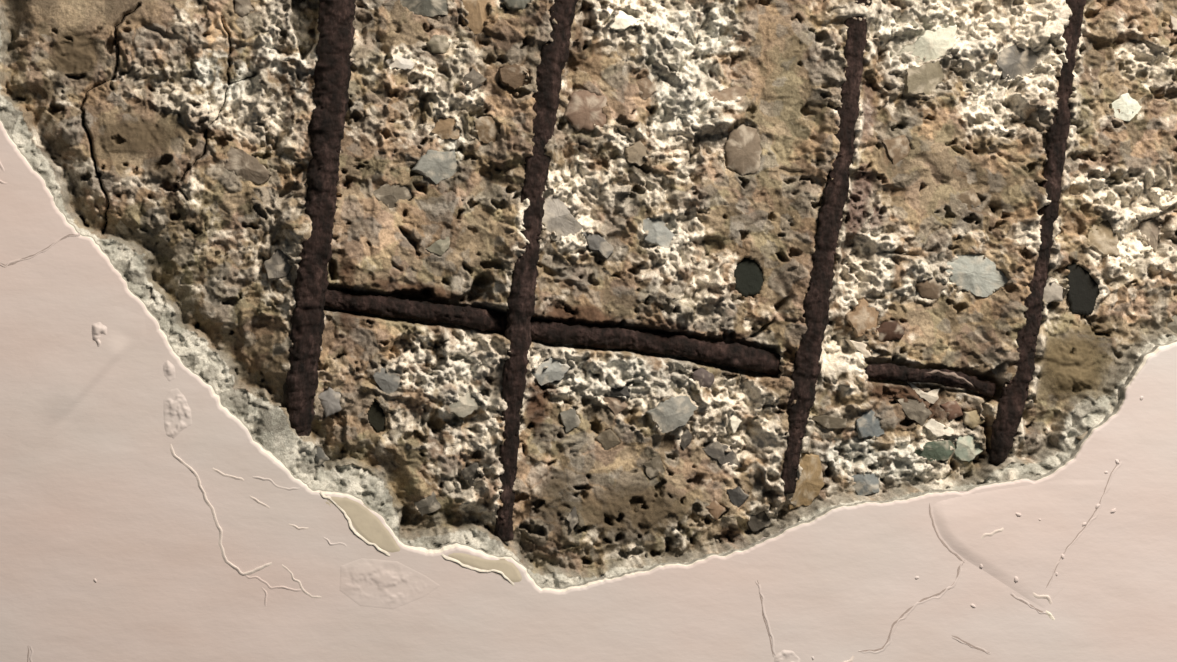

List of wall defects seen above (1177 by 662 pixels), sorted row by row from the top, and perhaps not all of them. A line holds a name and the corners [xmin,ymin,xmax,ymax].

crack [0,5,140,267]
spalling [0,0,557,564]
rust [377,281,457,303]
rust [528,383,557,427]
rust [531,305,620,328]
spalling [369,0,1177,592]
rust [870,385,946,419]
rust [927,370,975,388]
peeling [169,444,322,606]
crack [755,580,777,656]
crack [858,503,965,654]
crack [1012,461,1123,614]